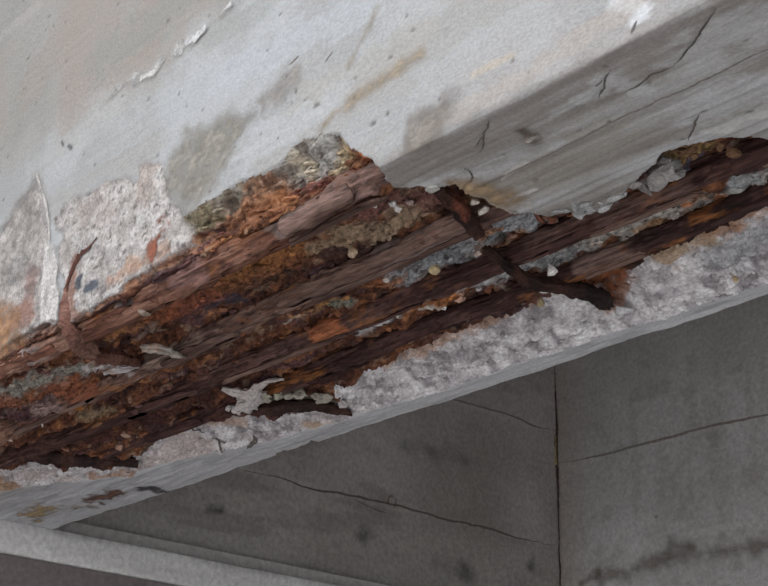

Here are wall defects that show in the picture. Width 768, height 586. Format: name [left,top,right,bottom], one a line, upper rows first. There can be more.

peeling [109,25,207,98]
crack [624,9,716,93]
crack [464,49,768,186]
water stain [167,118,247,200]
rust [447,181,520,205]
rust [146,217,170,262]
rust [0,305,22,360]
spalling [0,132,768,492]
rust [75,490,125,509]
crack [245,372,768,586]